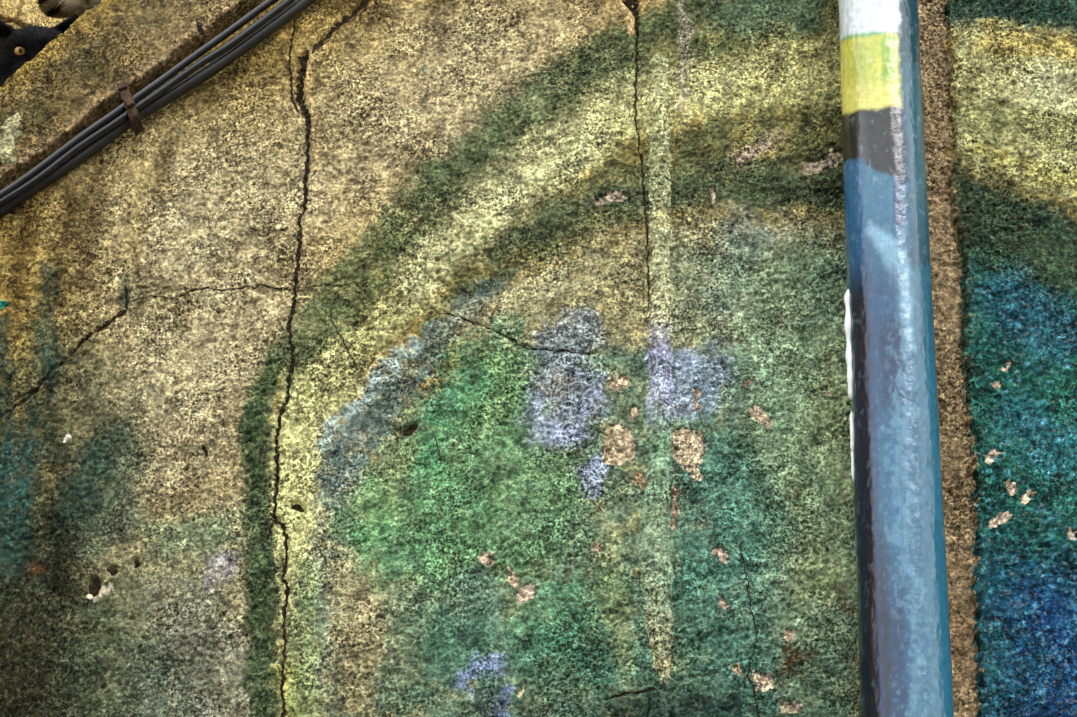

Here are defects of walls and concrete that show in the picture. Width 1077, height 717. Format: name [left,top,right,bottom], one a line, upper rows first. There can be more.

crack [615,0,651,302]
crack [2,0,378,717]
spalling [600,407,642,466]